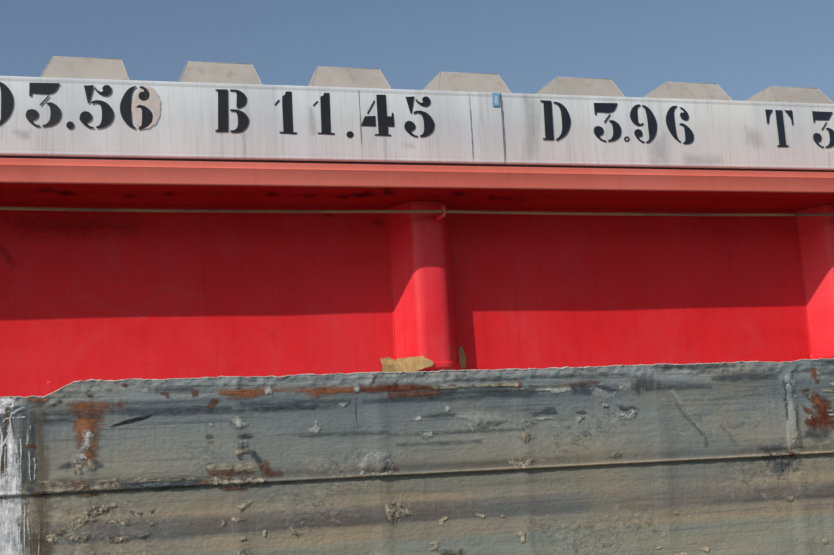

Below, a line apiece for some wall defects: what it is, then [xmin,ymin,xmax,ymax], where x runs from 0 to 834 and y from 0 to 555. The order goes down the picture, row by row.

peeling [380,356,434,372]
peeling [458,346,466,369]
rust [52,394,122,460]
rust [208,375,521,409]
rust [801,388,834,438]
damp [0,397,74,555]
peeling [34,417,281,544]